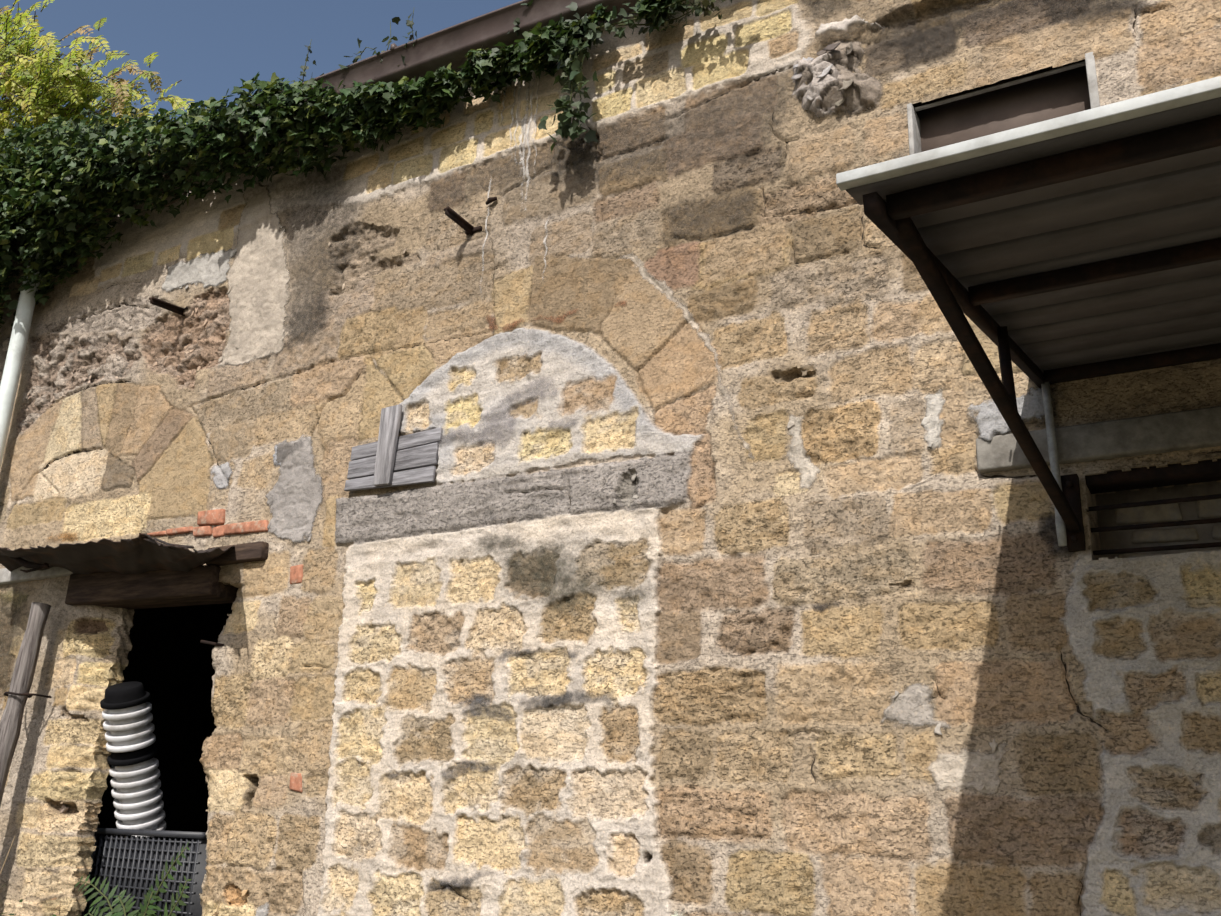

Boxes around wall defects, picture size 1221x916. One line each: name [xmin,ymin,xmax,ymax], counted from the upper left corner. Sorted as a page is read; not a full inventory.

spalling [328,221,422,296]
peeling [16,183,291,439]
spalling [73,617,110,635]
crack [1060,651,1106,730]